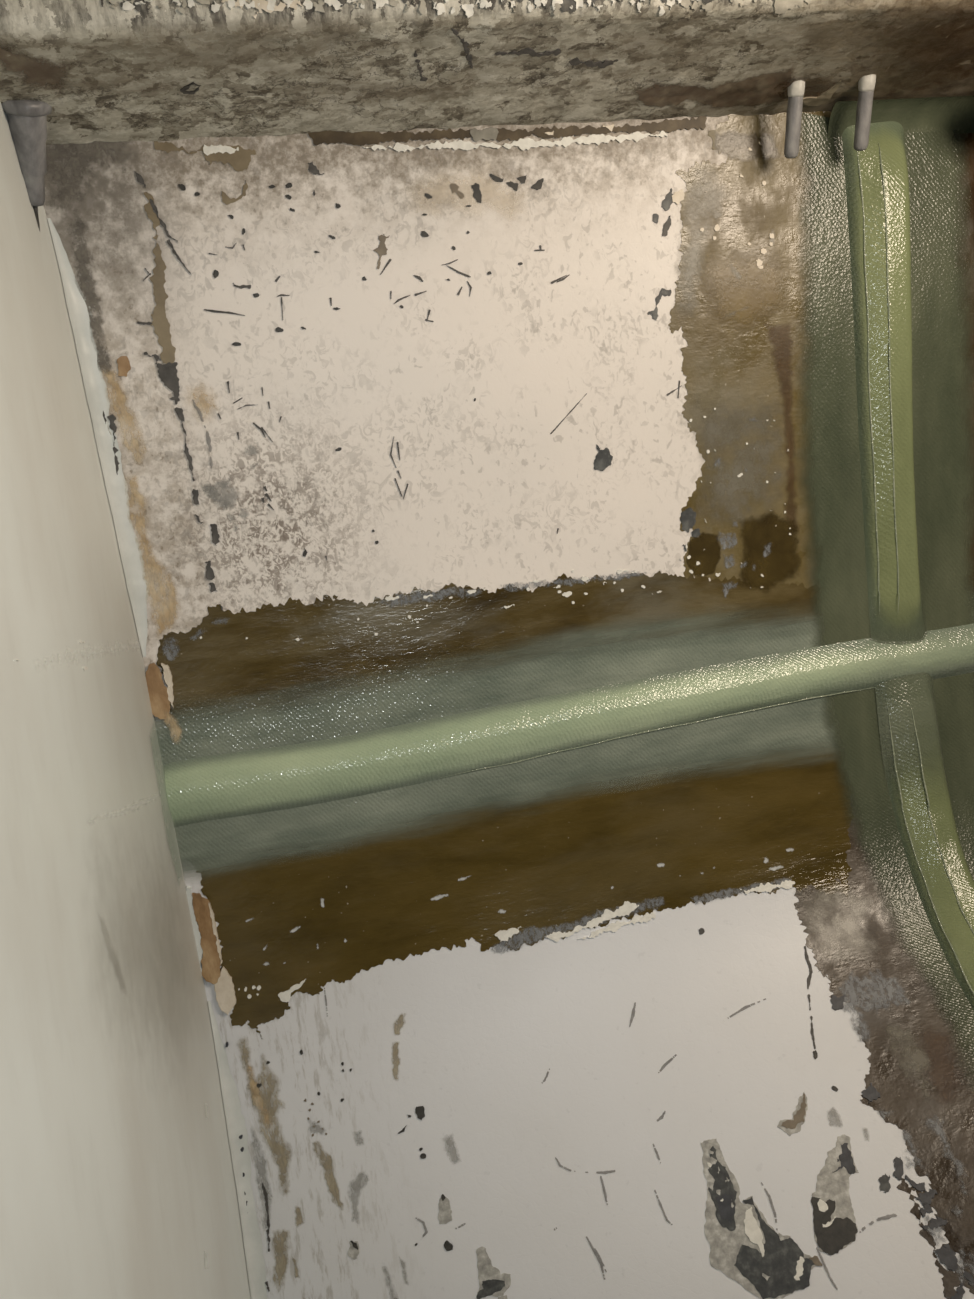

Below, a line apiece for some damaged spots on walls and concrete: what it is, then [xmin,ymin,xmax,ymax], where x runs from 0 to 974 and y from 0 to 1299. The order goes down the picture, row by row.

leakage [0,45,70,89]
leakage [633,68,794,108]
leakage [72,220,140,462]
leakage [129,478,177,633]
peeling [196,748,974,1299]